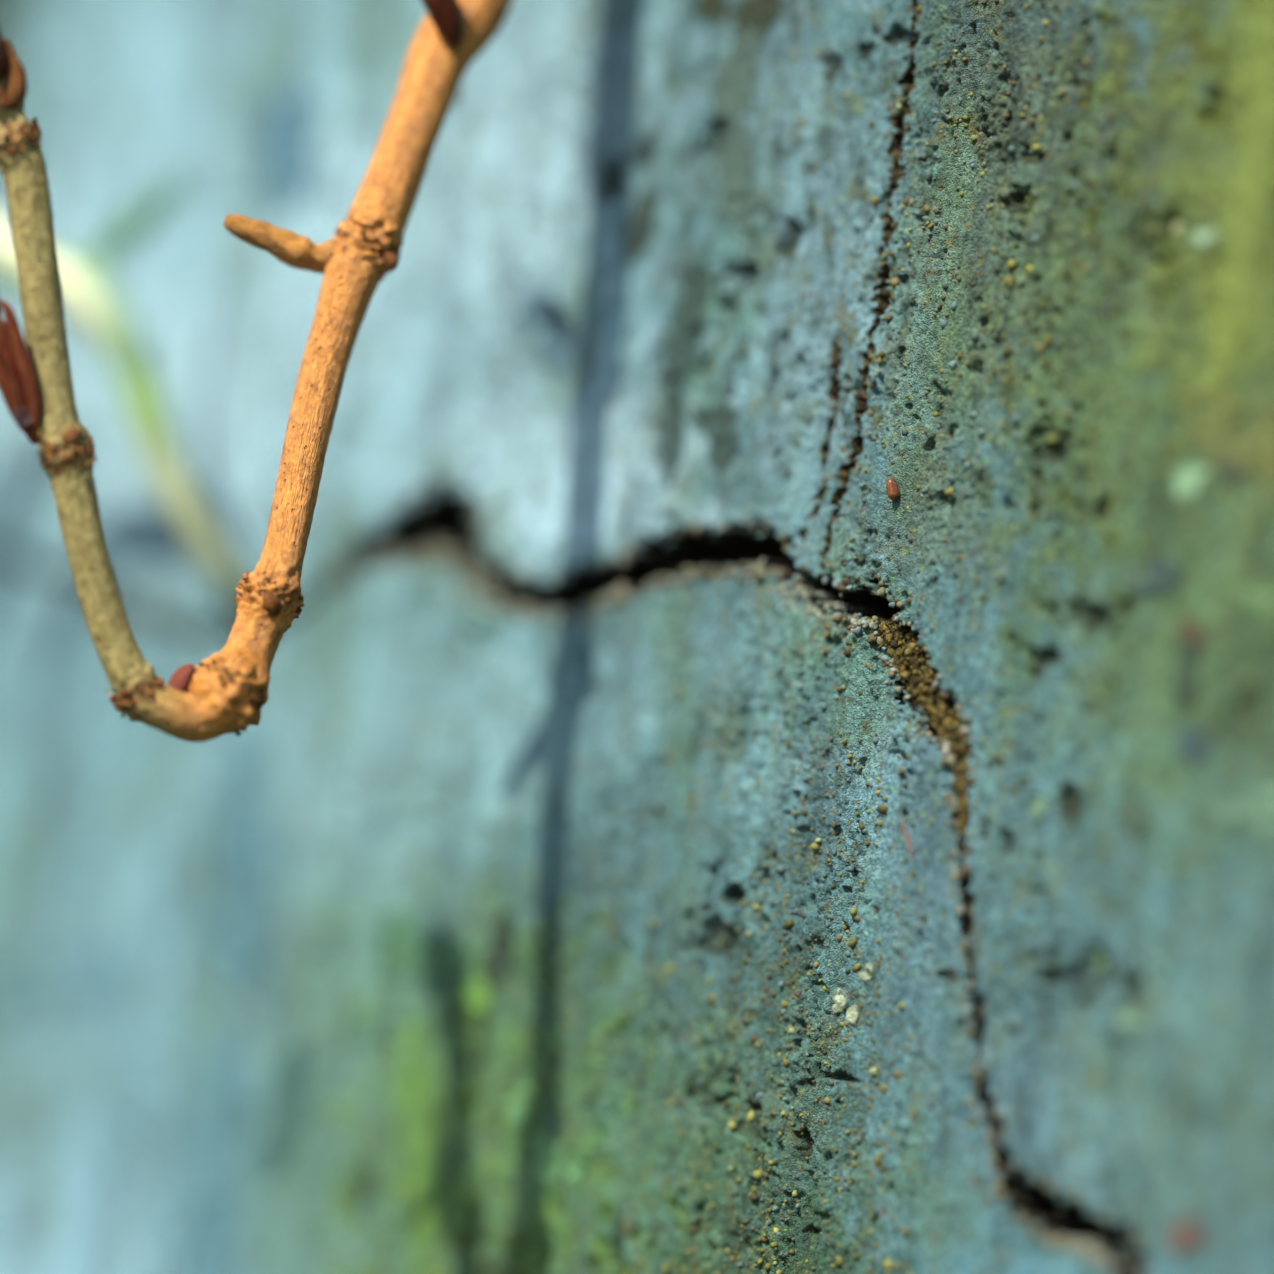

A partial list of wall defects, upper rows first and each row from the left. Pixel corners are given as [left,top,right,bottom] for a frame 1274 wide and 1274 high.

crack [122,586,231,647]
crack [292,0,1149,1274]